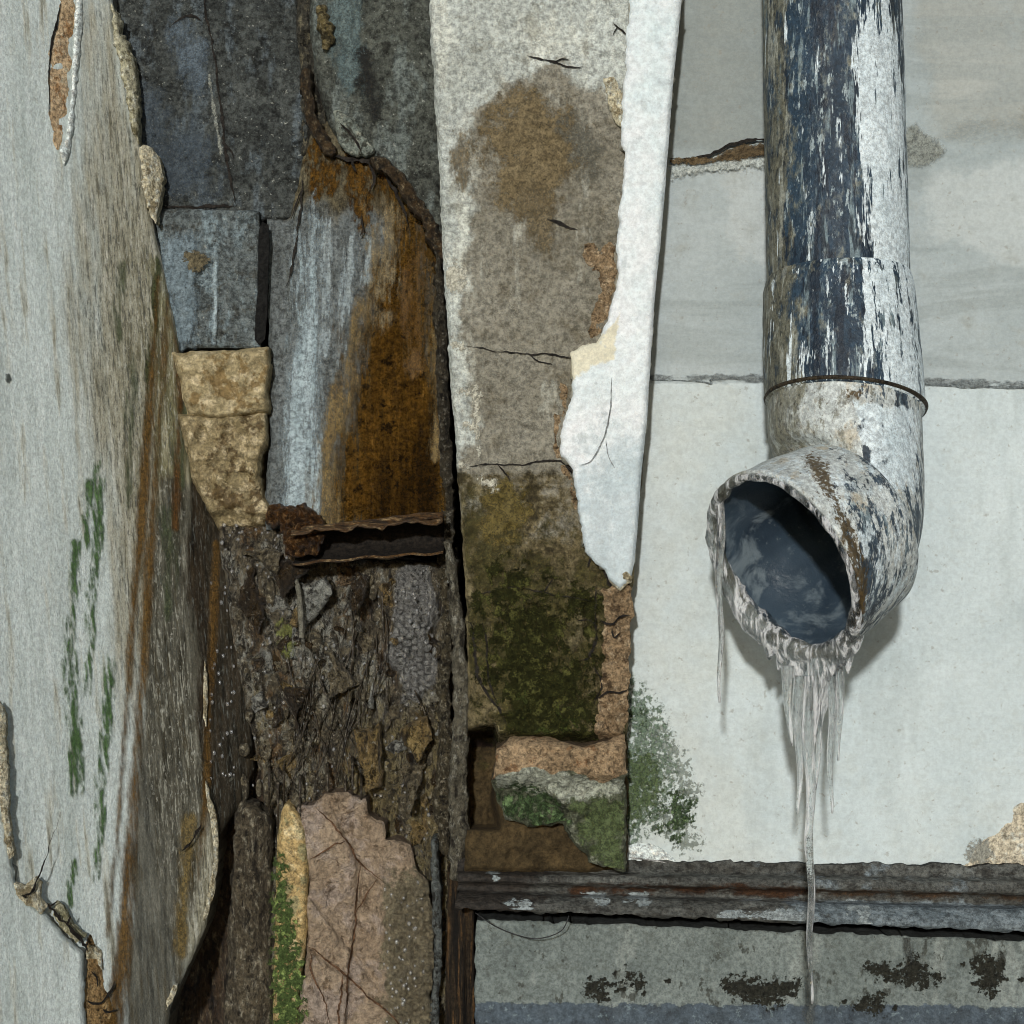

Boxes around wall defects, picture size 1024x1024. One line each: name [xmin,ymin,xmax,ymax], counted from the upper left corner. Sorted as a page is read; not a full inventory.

spalling [48,0,84,165]
leakage [449,81,605,253]
crack [670,138,765,180]
rust [303,137,446,528]
leakage [446,259,468,293]
leakage [459,461,499,492]
crack [465,459,574,482]
flaking render [491,0,684,872]
rust [107,278,182,1024]
rust [174,541,219,959]
crack [22,816,89,951]
spalling [963,803,1024,866]